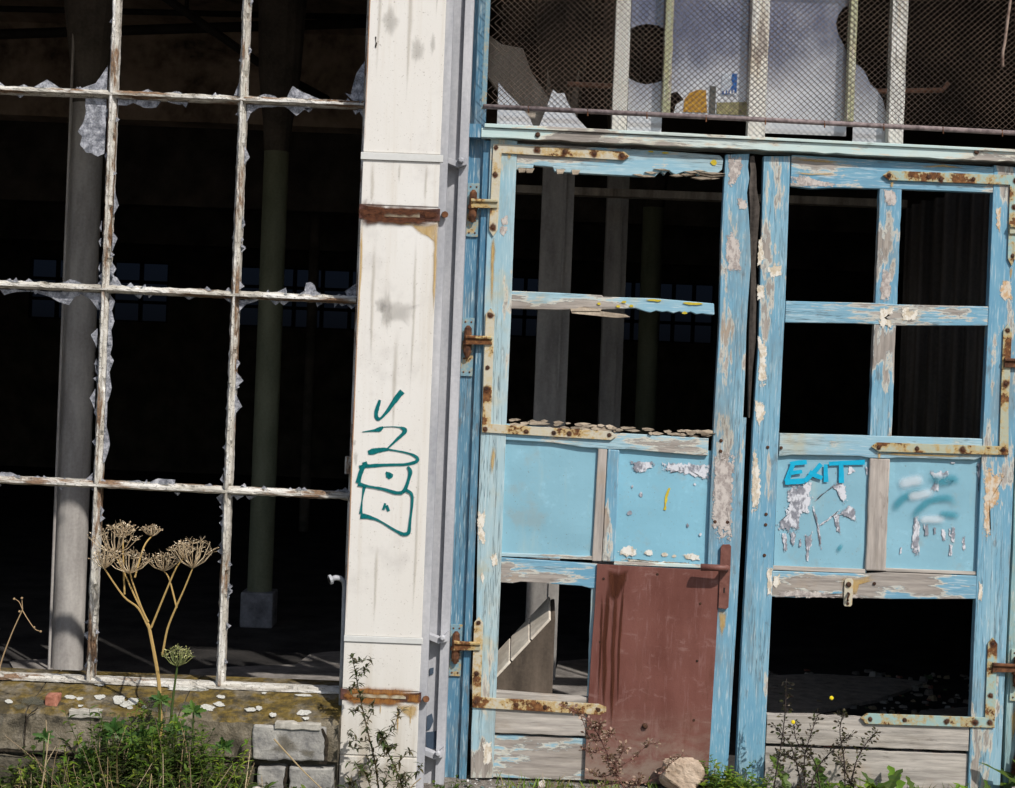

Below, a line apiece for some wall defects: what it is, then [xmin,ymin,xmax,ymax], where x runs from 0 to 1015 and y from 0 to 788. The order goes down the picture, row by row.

peeling [710,154,743,187]
rust [360,204,437,298]
peeling [724,232,741,271]
peeling [631,452,735,544]
peeling [778,466,868,561]
peeling [899,516,966,558]
peeling [930,462,955,493]
peeling [977,463,1005,537]
rust [599,572,626,715]
rust [344,687,419,730]